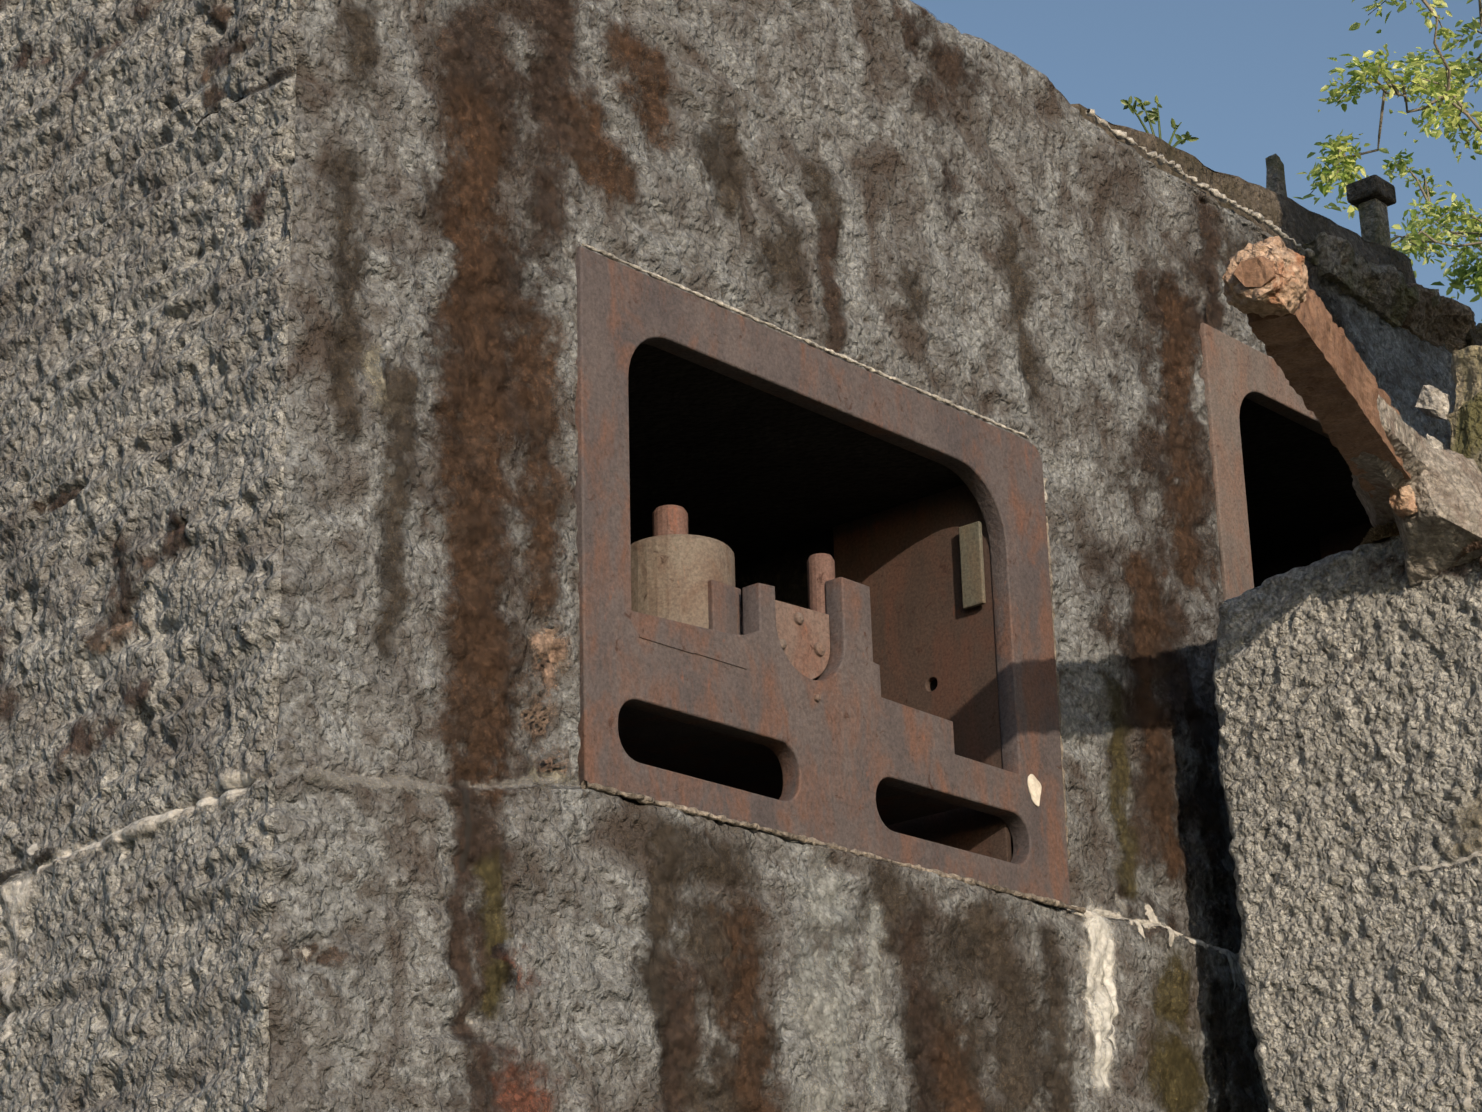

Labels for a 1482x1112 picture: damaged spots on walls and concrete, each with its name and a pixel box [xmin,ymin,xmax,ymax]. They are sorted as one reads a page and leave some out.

corrosion [605,21,671,150]
damp [759,159,847,357]
damp [1002,227,1040,403]
damp [375,367,419,656]
corrosion [425,0,637,1112]
crack [0,772,260,887]
crack [1401,851,1482,875]
damp [0,875,31,1042]
damp [634,819,781,1112]
damp [797,868,1118,1112]
damp [1149,951,1248,1112]
crack [1460,1030,1473,1112]